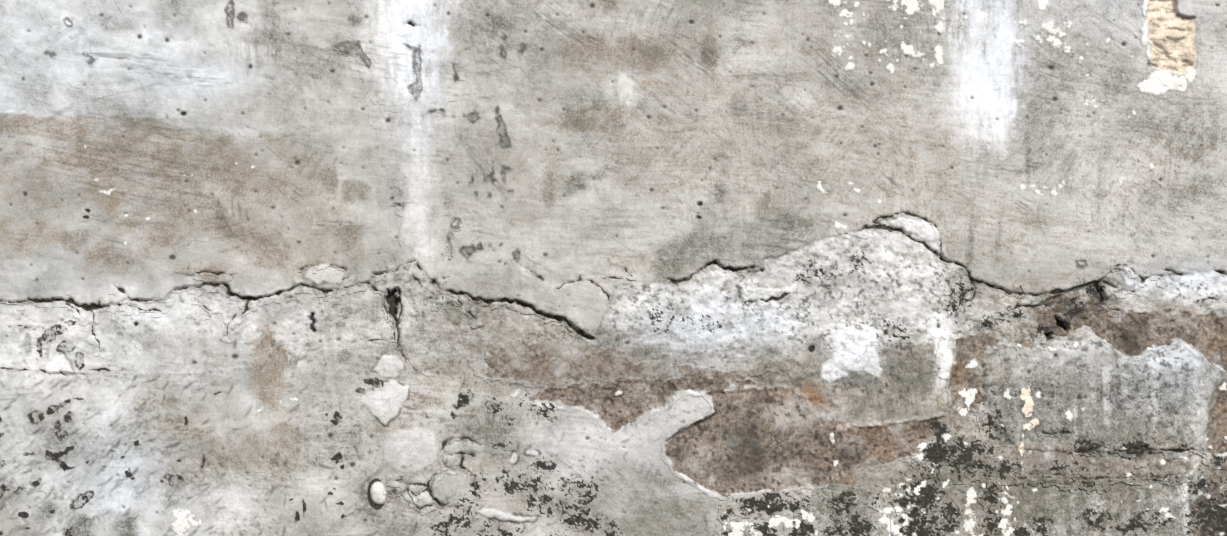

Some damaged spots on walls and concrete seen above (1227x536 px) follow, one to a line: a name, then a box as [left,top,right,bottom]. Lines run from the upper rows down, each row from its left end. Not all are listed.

peeling [828,0,1112,77]
spalling [1109,0,1200,97]
damp [913,0,1049,235]
damp [0,106,372,294]
damp [347,0,480,350]
crack [837,206,1227,317]
damp [231,310,319,487]
crack [331,331,434,394]
crack [0,256,821,383]
peeling [877,486,899,536]
peeling [962,482,983,536]
peeling [1000,485,1039,536]